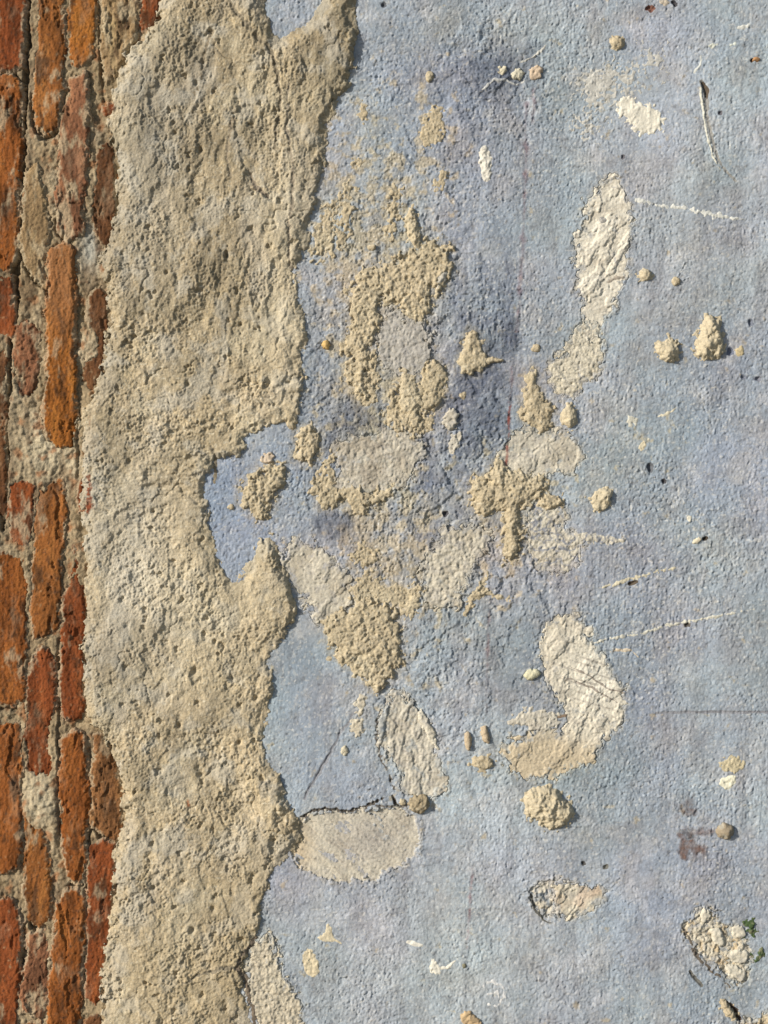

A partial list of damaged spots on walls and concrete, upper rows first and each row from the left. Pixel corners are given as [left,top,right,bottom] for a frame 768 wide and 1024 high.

spalling [0,0,449,1024]
crack [300,709,408,819]